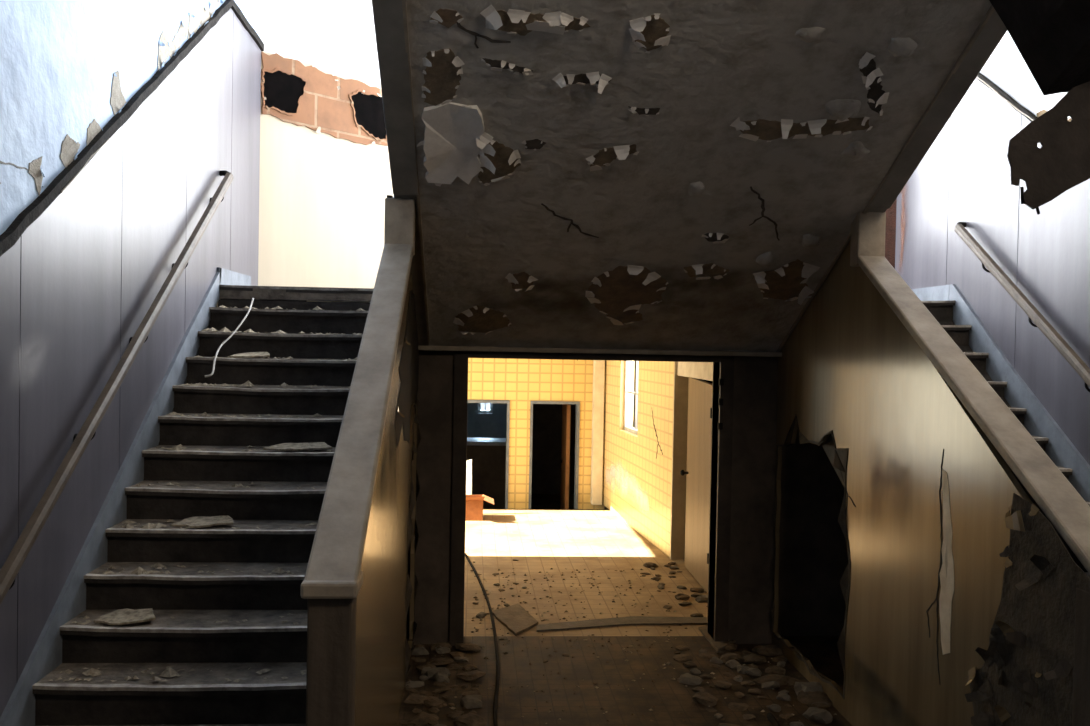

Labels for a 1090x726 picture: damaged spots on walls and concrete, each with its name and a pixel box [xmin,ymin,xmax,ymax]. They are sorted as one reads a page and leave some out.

peeling [480,5,590,36]
peeling [110,70,126,115]
spalling [261,52,388,146]
peeling [417,48,546,186]
peeling [552,71,612,94]
peeling [730,52,889,142]
peeling [60,119,103,168]
crack [0,161,29,184]
peeling [28,156,45,196]
crack [541,204,599,238]
crack [749,186,779,241]
peeling [965,493,1090,726]